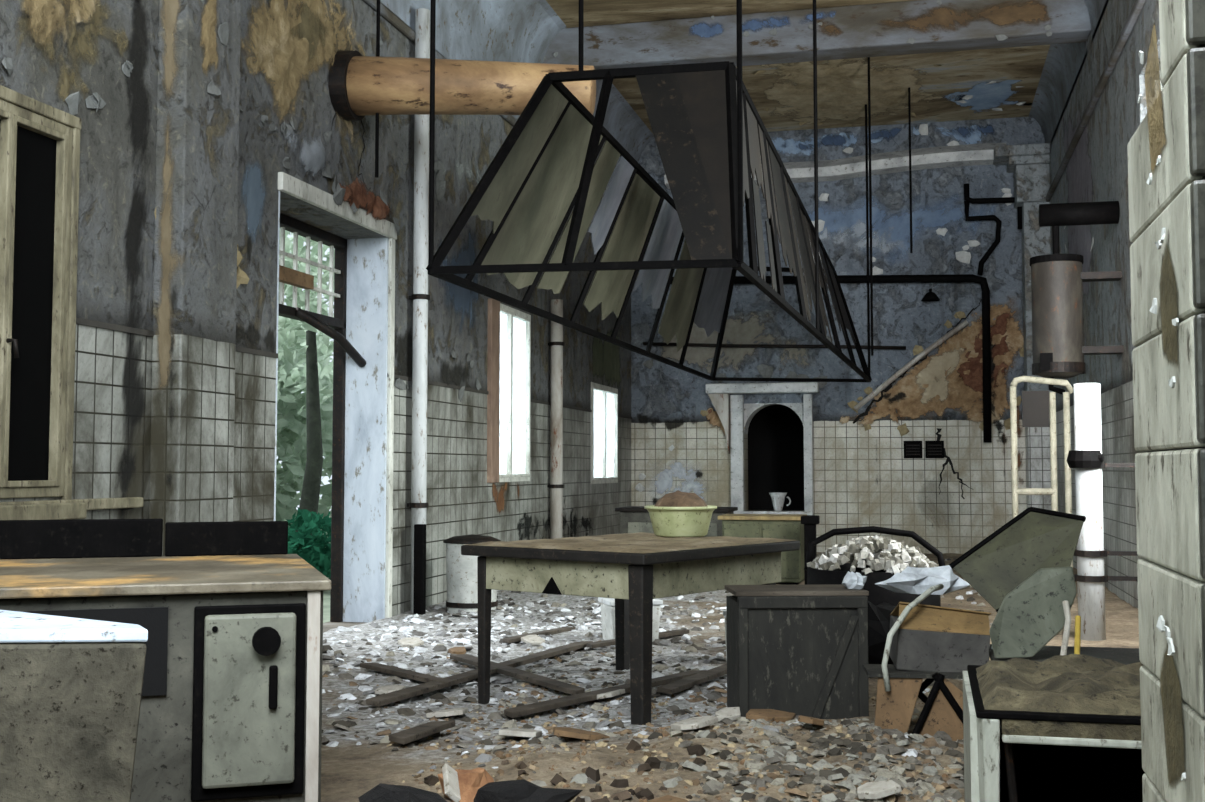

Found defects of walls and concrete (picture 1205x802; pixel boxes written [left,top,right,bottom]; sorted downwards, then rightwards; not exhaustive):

peeling [742,17,790,37]
peeling [772,80,1025,156]